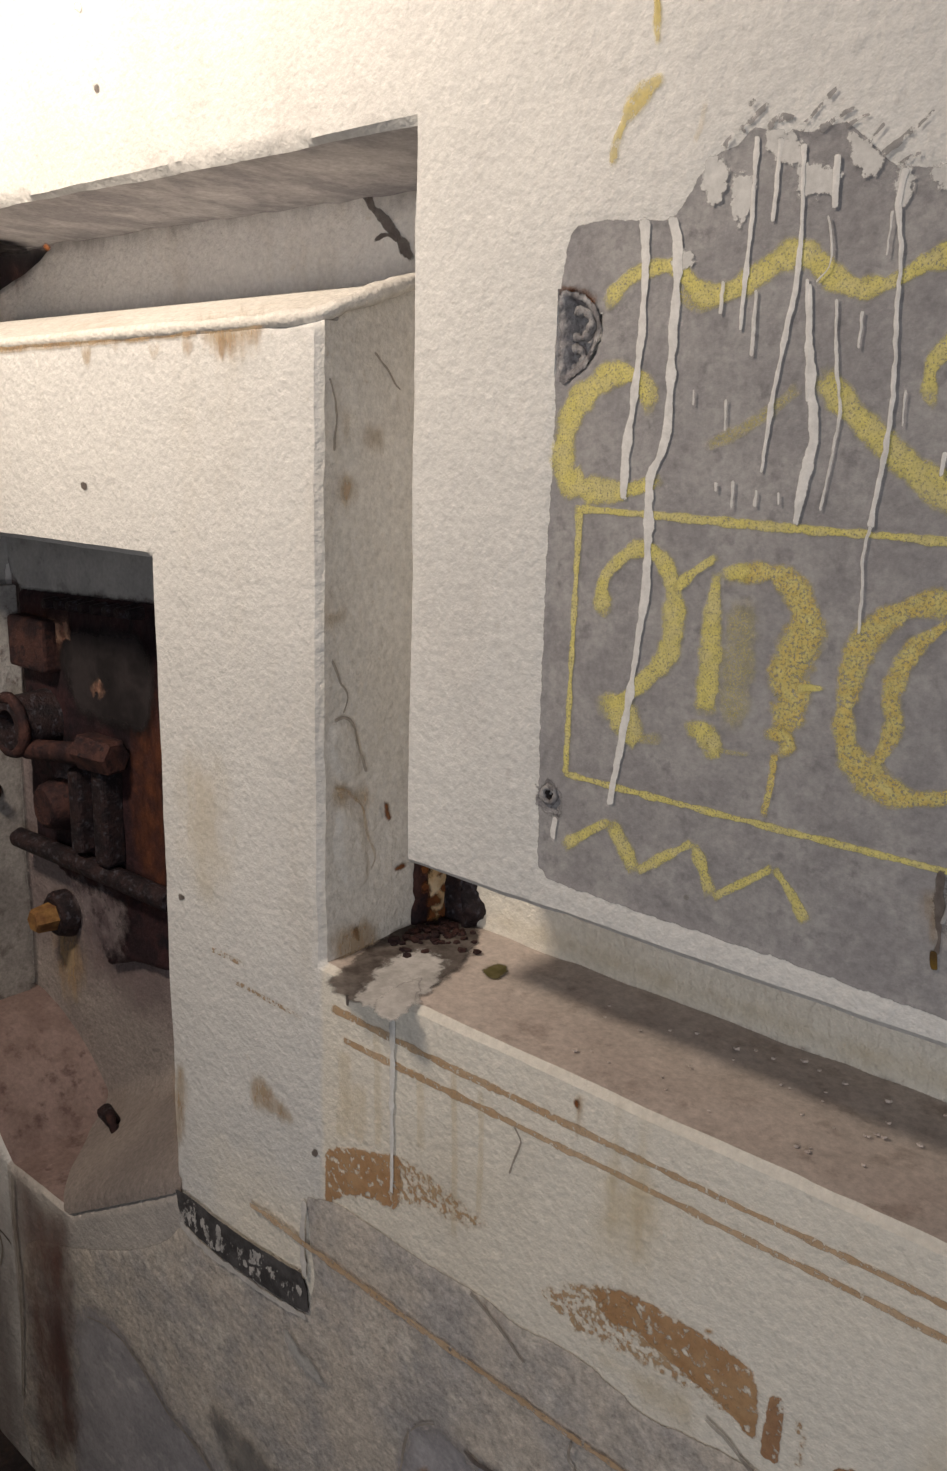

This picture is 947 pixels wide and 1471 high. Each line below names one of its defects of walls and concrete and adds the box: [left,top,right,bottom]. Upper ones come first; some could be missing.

peeling [537,87,947,1020]
corrosion [133,729,165,883]
flaking render [23,1190,748,1471]